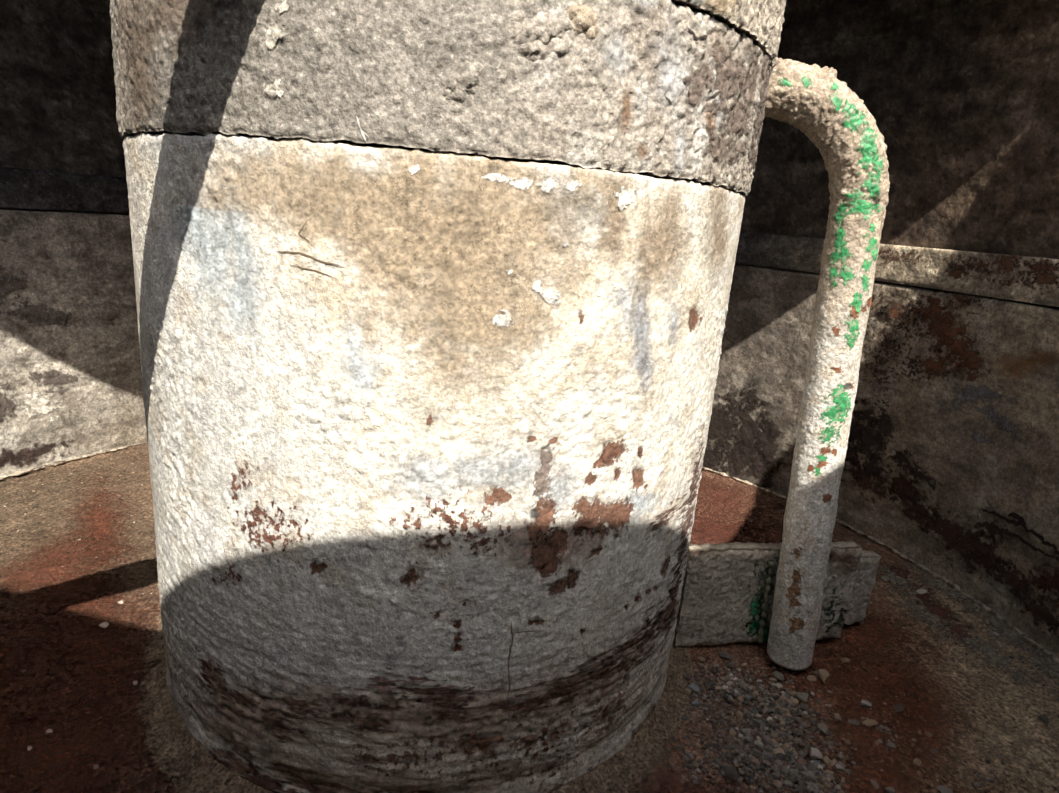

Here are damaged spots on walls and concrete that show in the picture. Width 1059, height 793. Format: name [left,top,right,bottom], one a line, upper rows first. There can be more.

crack [688,27,708,40]
corrosion [204,460,312,591]
corrosion [0,478,162,793]
corrosion [189,588,680,793]